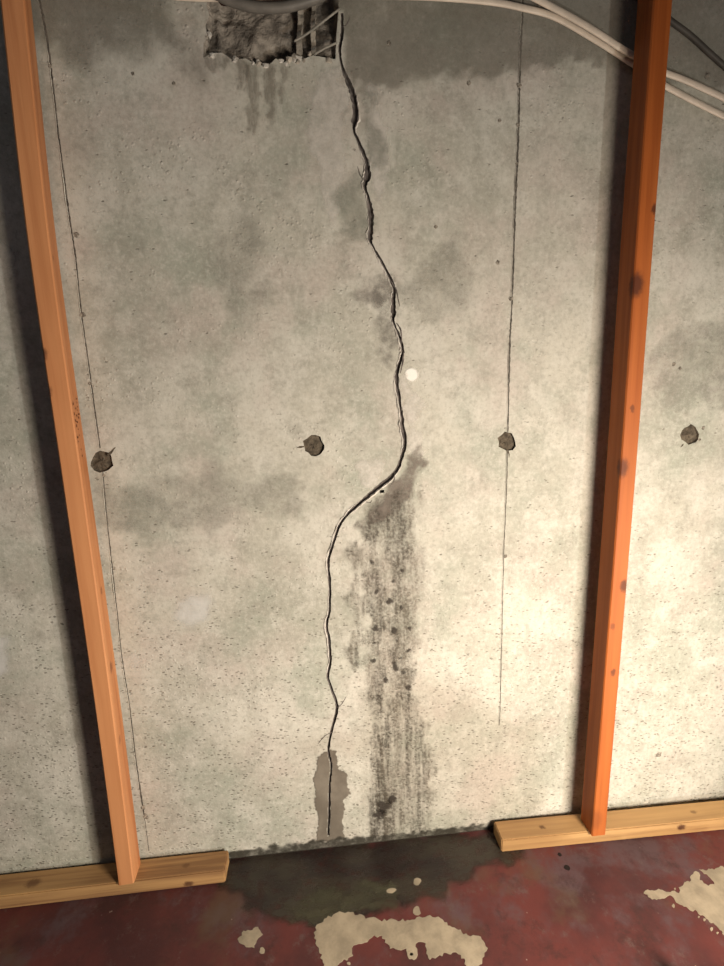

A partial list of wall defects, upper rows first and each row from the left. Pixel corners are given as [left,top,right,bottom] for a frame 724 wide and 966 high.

spalling [203,0,341,68]
damp [339,0,638,90]
damp [308,72,349,218]
damp [369,107,389,193]
crack [318,13,407,836]
damp [218,375,522,926]
peeling [314,906,488,966]
peeling [644,866,724,935]